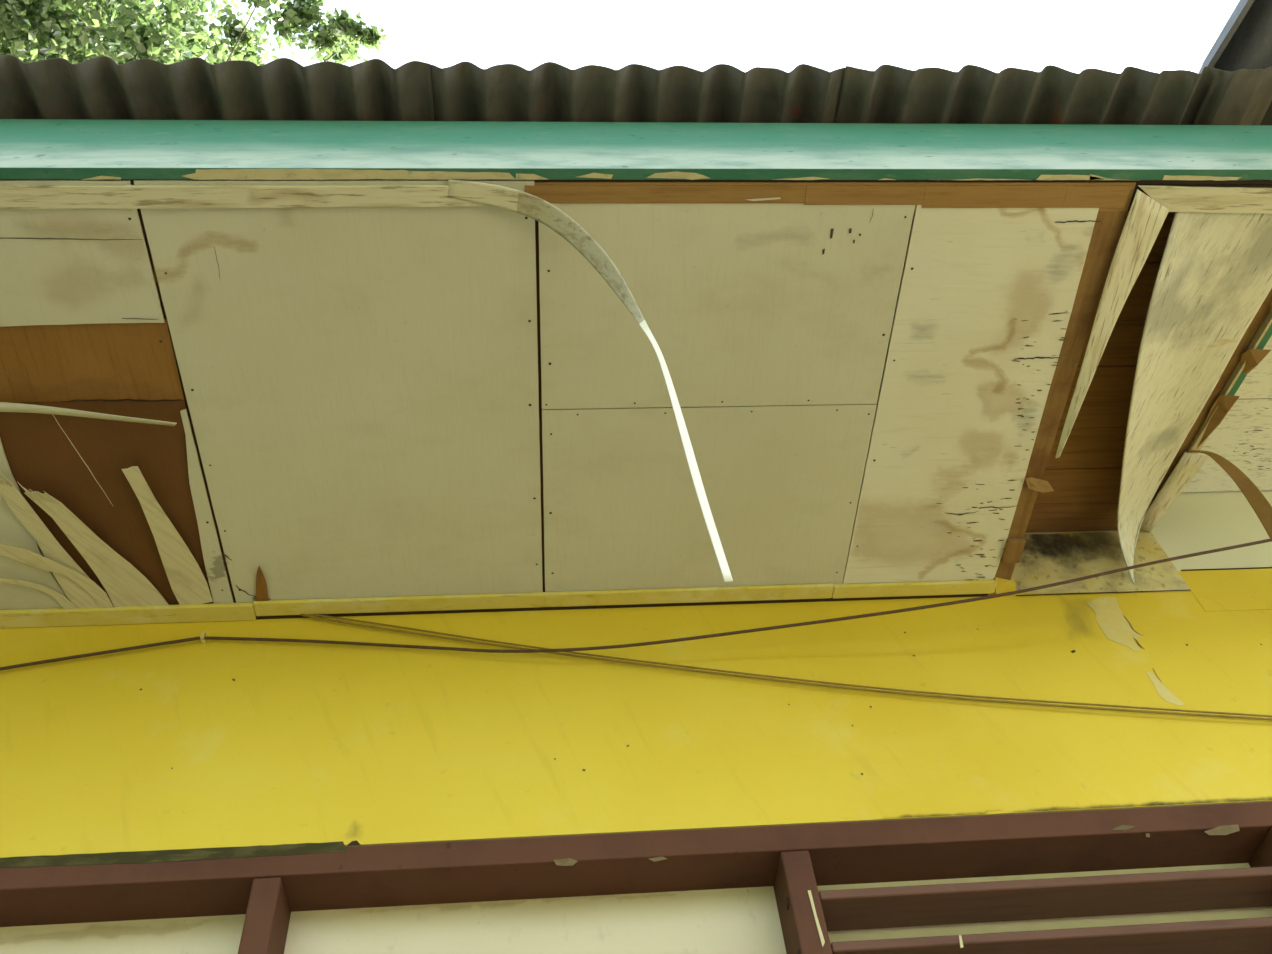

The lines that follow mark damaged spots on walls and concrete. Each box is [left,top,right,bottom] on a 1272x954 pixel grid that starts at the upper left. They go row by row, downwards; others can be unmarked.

peeling [183,169,1132,582]
peeling [0,318,235,609]
leakage [1024,532,1110,559]
peeling [256,566,269,601]
spalling [1086,597,1144,652]
spalling [1146,669,1184,706]